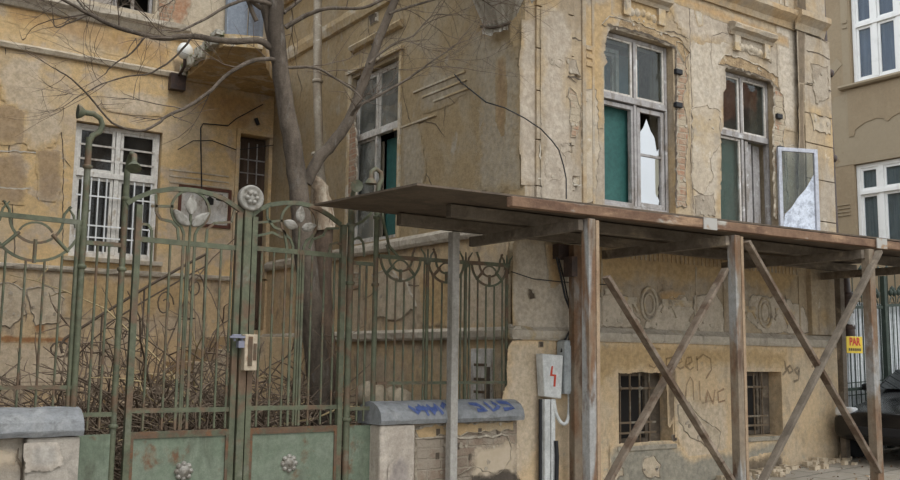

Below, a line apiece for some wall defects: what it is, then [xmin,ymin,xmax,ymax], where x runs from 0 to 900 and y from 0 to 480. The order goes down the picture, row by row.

peeling [560,87,601,203]
peeling [601,16,722,217]
spalling [642,455,661,478]